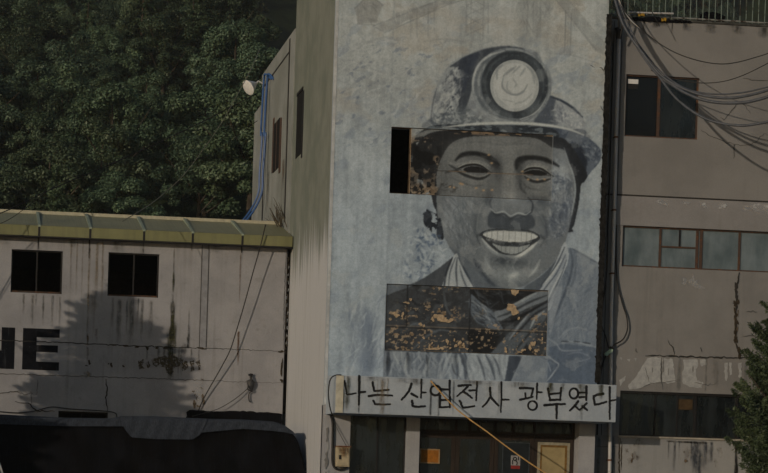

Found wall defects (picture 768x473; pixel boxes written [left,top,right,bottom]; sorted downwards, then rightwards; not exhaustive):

damp [158,304,176,376]
crack [636,272,756,388]
crack [0,373,280,412]
peeling [111,344,205,409]
peeling [619,357,707,389]
damp [667,440,713,473]